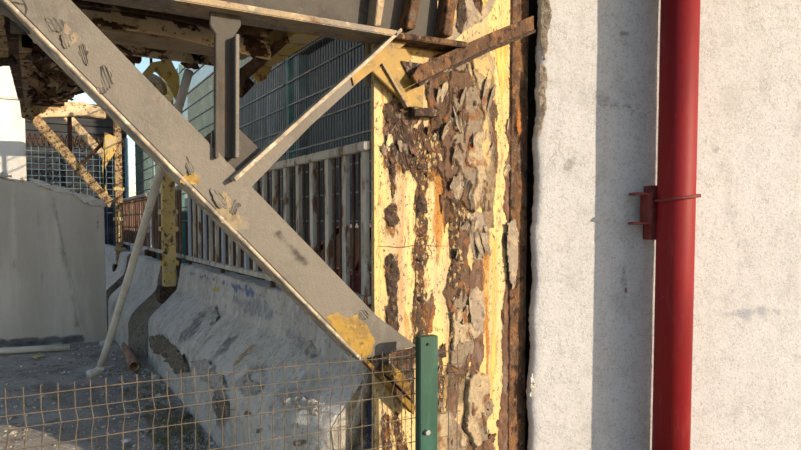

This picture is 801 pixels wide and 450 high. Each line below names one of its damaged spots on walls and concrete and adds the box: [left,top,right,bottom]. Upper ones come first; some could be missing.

flaking render [536,0,552,138]
spalling [29,178,106,207]
rust [381,100,444,366]
peeling [425,44,510,450]
rust [438,108,521,450]
peeling [507,219,519,289]
leakage [0,336,84,347]
spalling [149,334,263,421]
rust [381,410,408,450]